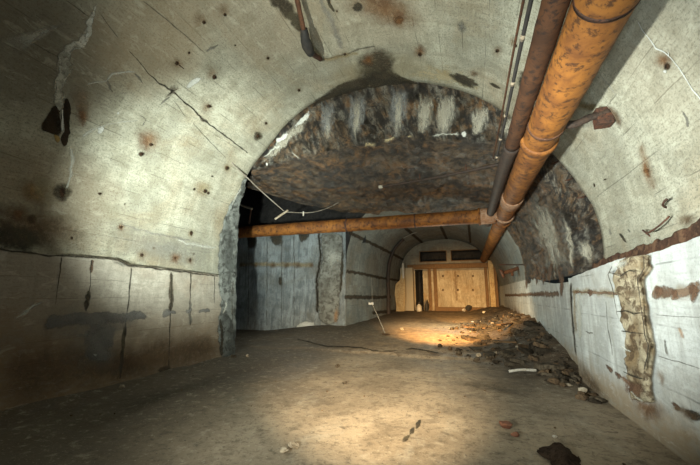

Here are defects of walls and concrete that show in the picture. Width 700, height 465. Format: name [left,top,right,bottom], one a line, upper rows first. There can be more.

crack [638,22,700,99]
spalling [42,98,71,146]
rust [139,135,153,156]
crack [129,51,248,158]
damp [266,50,477,166]
damp [418,96,488,137]
crack [0,248,217,378]
rust [652,281,700,302]